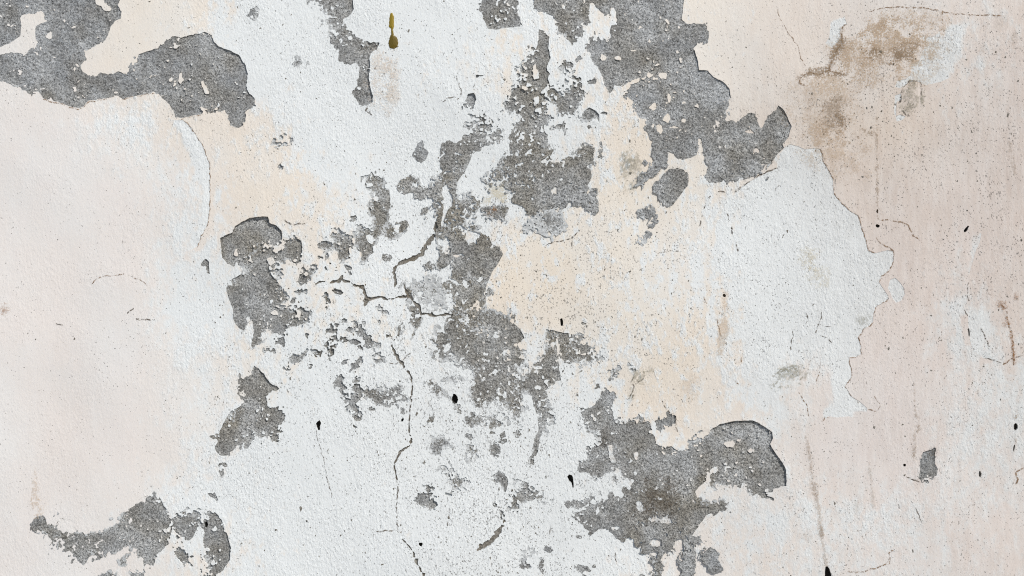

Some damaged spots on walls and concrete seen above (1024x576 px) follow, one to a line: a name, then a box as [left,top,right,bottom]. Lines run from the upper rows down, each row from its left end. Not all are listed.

peeling [0,0,256,255]
water stain [798,31,847,82]
peeling [30,491,231,576]
crack [315,222,453,576]
peeling [209,0,905,576]
peeling [918,448,938,484]